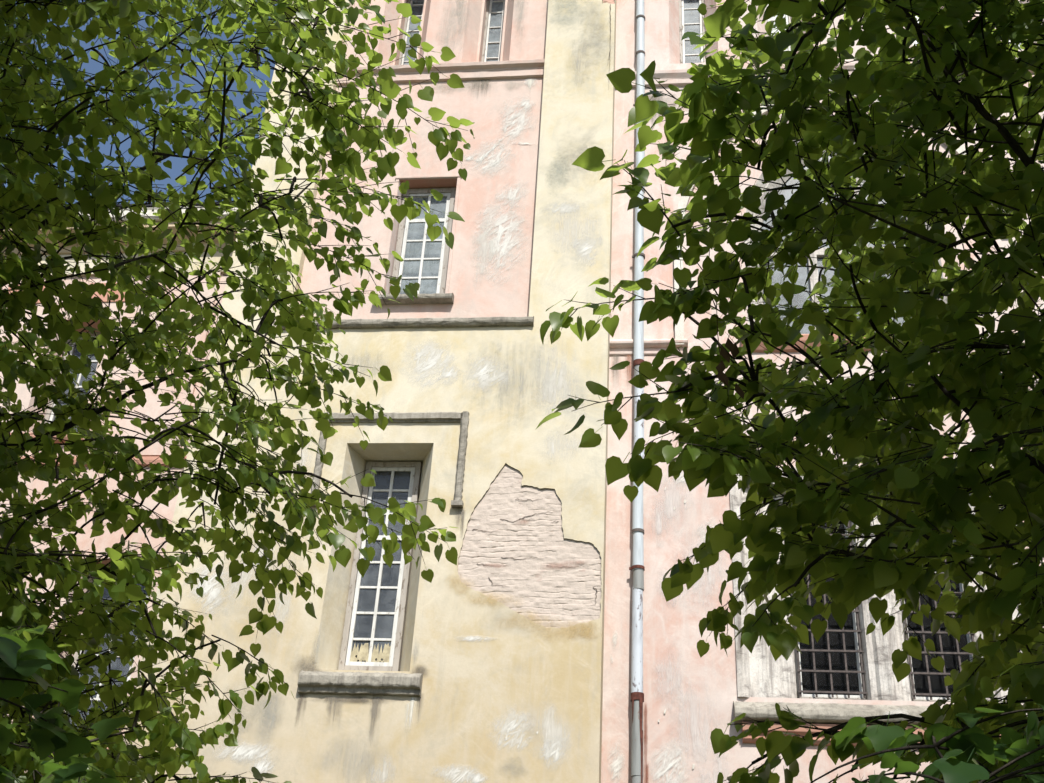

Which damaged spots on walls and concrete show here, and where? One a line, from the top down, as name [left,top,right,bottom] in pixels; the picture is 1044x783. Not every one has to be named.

flaking render [458,463,602,628]
damp [326,697,379,725]